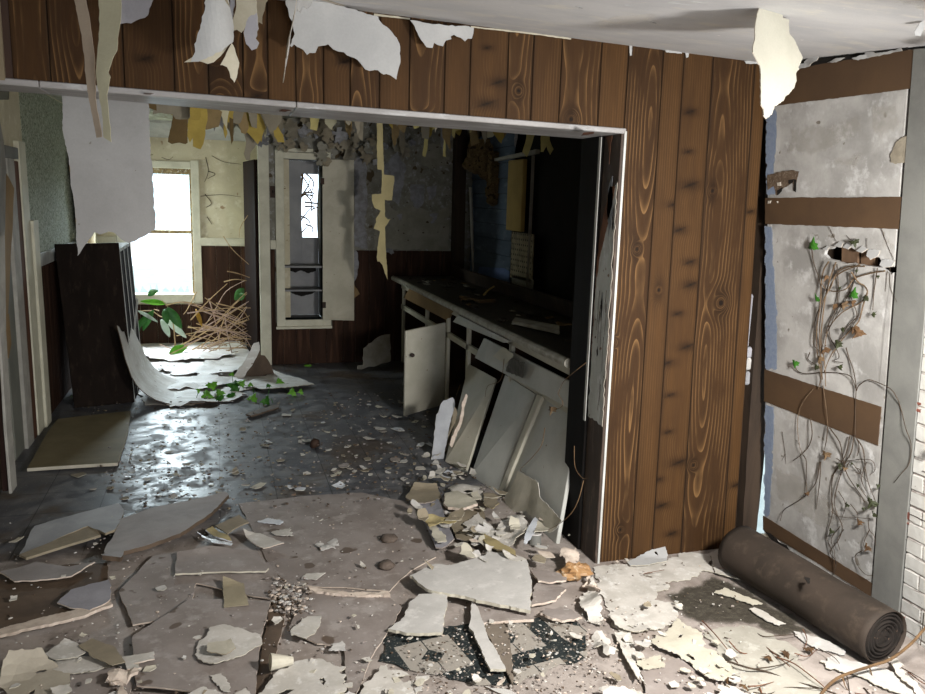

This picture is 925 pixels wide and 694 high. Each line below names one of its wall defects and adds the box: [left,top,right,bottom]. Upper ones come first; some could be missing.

peeling [230,0,268,50]
peeling [410,20,474,48]
peeling [914,21,925,36]
peeling [745,8,914,119]
peeling [522,134,553,157]
peeling [145,93,394,279]
flaking render [823,241,895,268]
leakage [668,577,810,635]